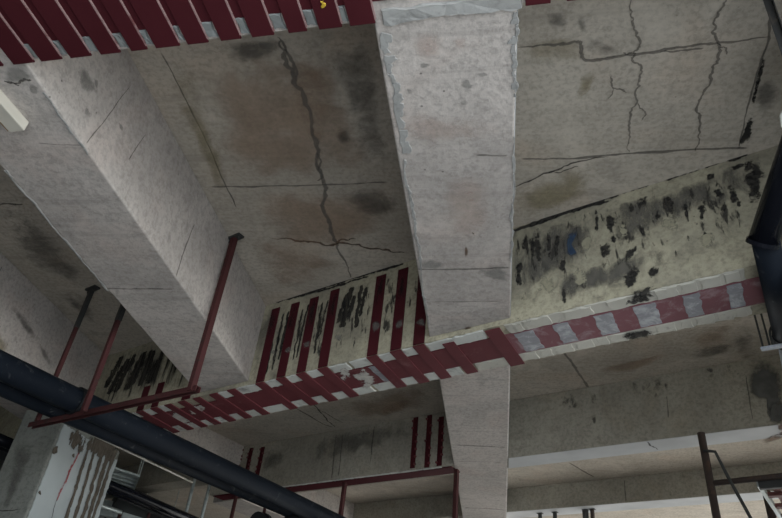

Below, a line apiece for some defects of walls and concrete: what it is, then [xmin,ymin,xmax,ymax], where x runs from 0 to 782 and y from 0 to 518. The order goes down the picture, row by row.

crack [518,0,766,152]
crack [272,37,404,303]
crack [514,154,747,232]
water stain [619,182,725,239]
water stain [724,161,764,203]
water stain [523,225,588,282]
water stain [562,260,639,296]
peeling [64,430,118,518]